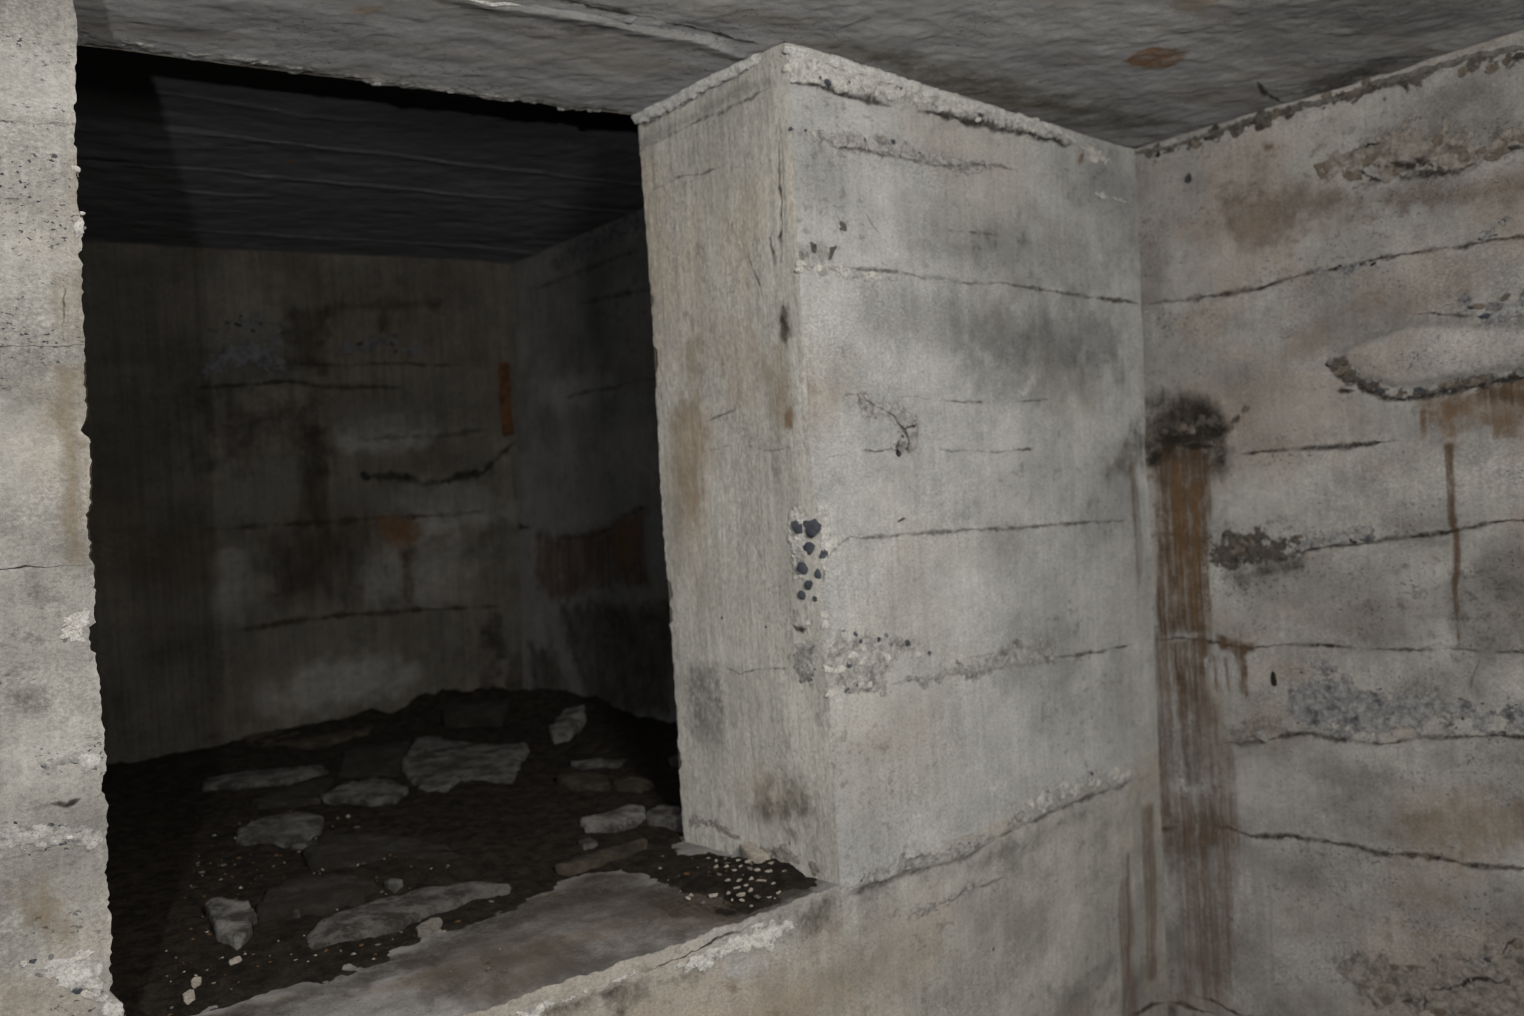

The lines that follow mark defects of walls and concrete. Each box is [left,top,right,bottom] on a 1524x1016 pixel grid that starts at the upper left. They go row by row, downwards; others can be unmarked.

crack [1024,235,1524,303]
rust [1422,381,1524,608]
crack [0,563,60,571]
spalling [1209,523,1383,570]
spalling [787,504,1056,700]
rust [1145,393,1254,996]
crack [1219,826,1524,870]
spalling [674,915,795,973]
spalling [516,970,636,1016]